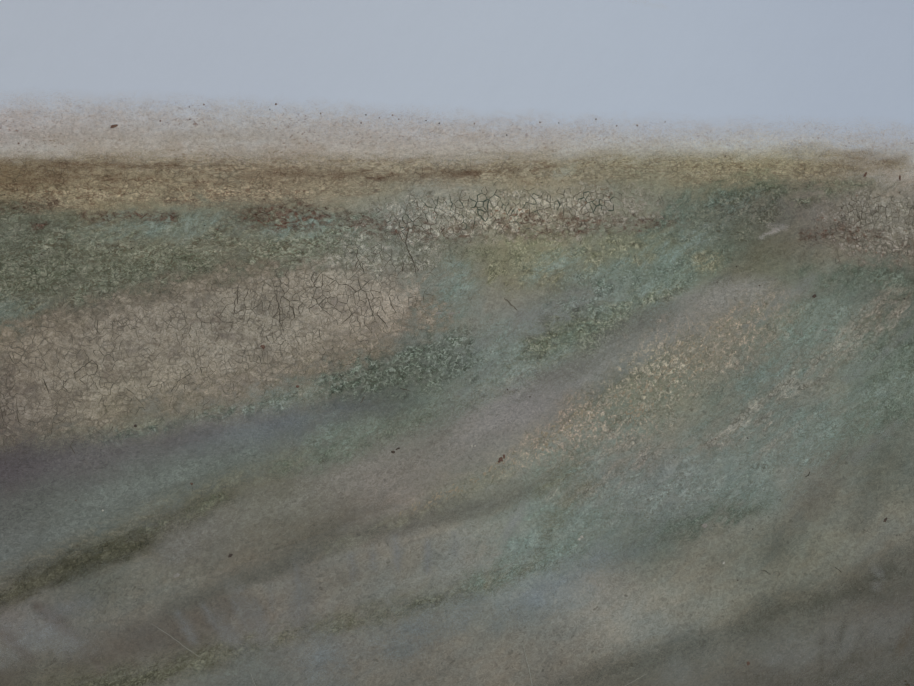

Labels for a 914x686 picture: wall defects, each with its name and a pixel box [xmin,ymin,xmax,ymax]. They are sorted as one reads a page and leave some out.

crack [0,179,680,453]
crack [792,180,914,271]